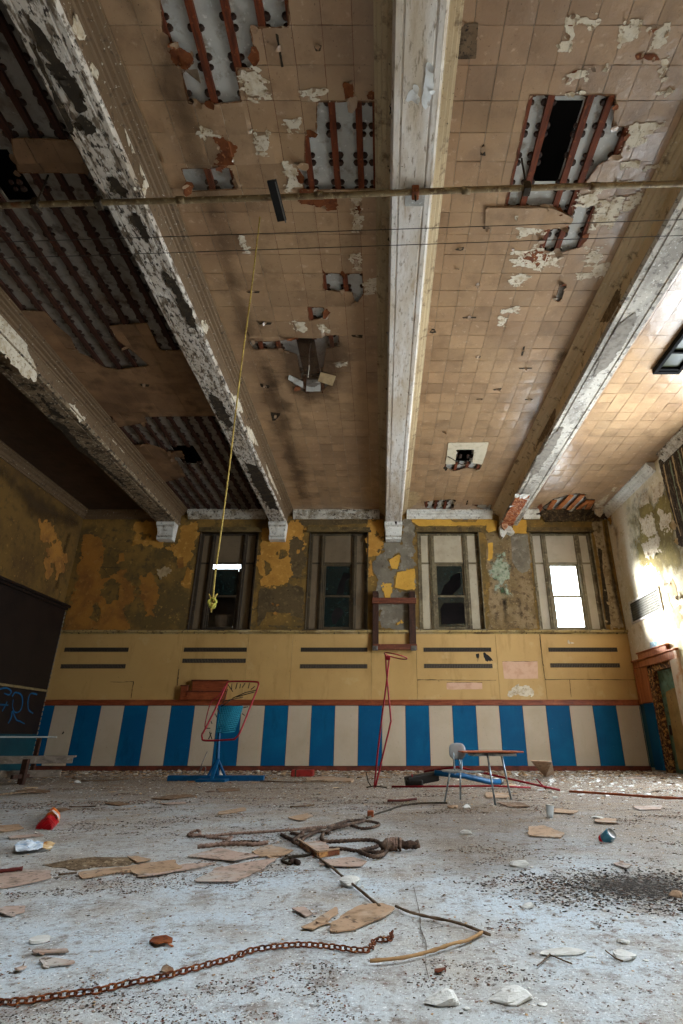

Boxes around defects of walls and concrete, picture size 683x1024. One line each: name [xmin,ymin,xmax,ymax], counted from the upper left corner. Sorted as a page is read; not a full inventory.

peeling [237,65,272,103]
peeling [556,13,601,53]
peeling [617,14,675,98]
peeling [106,165,149,198]
peeling [130,212,150,243]
peeling [571,121,666,230]
peeling [0,315,86,422]
peeling [38,518,200,630]
peeling [245,463,281,510]
peeling [256,491,538,630]
peeling [592,487,624,630]
spalling [636,444,683,629]